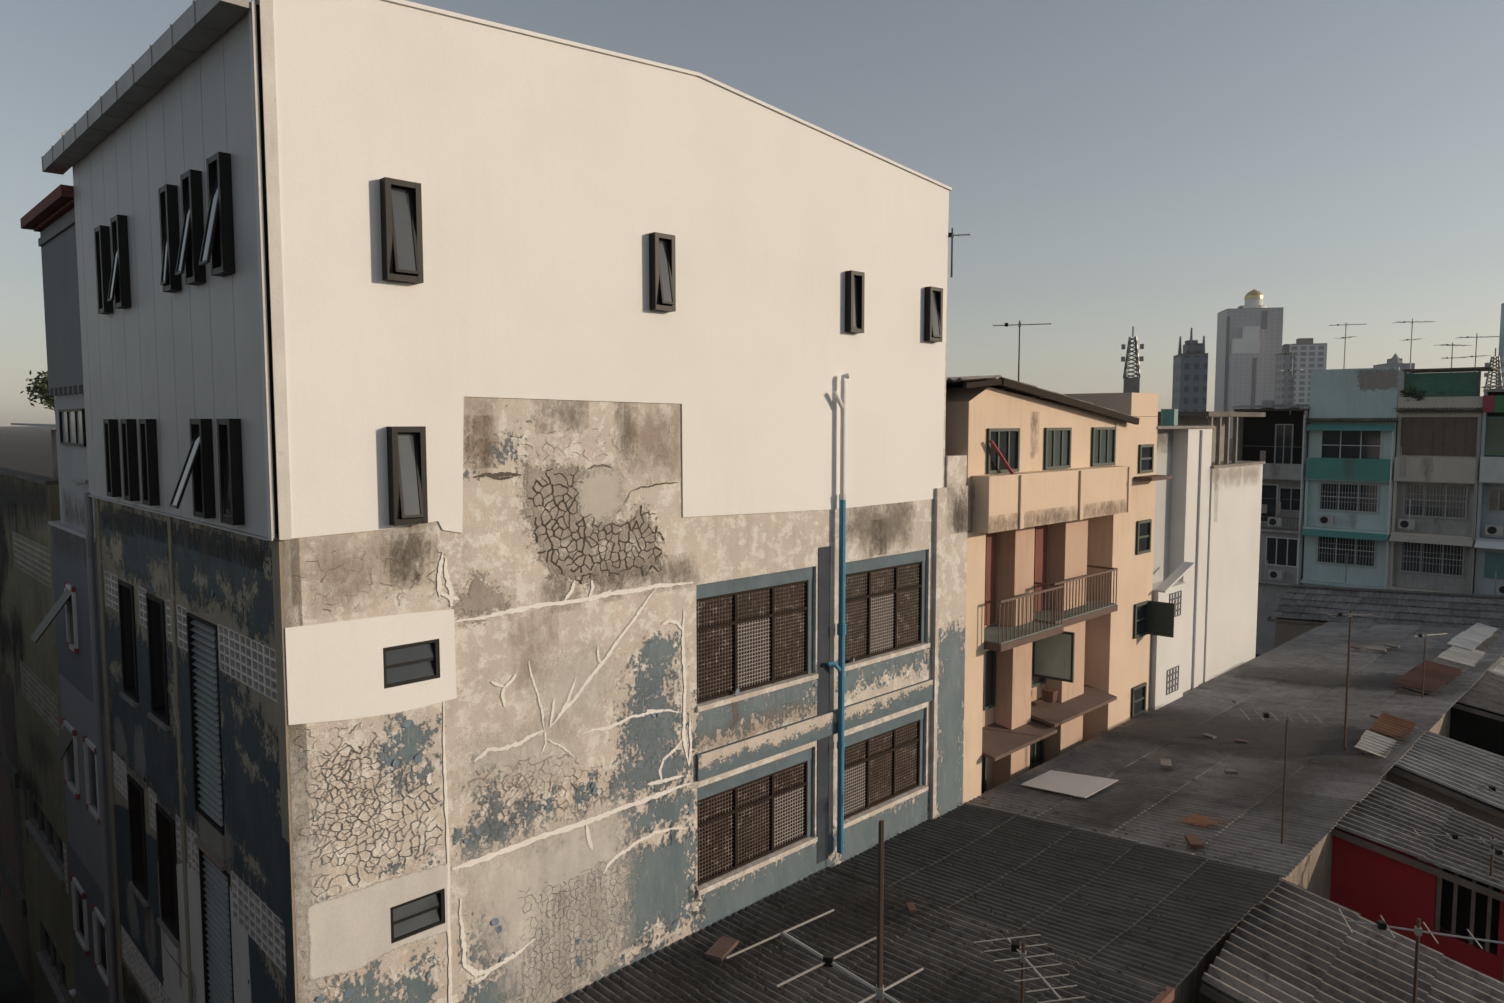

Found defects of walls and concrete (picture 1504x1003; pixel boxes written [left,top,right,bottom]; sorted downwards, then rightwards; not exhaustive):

damp [0,474,86,891]
peeling [172,517,275,646]
crack [294,426,694,1003]
flaking render [463,405,667,592]
peeling [218,616,966,1003]